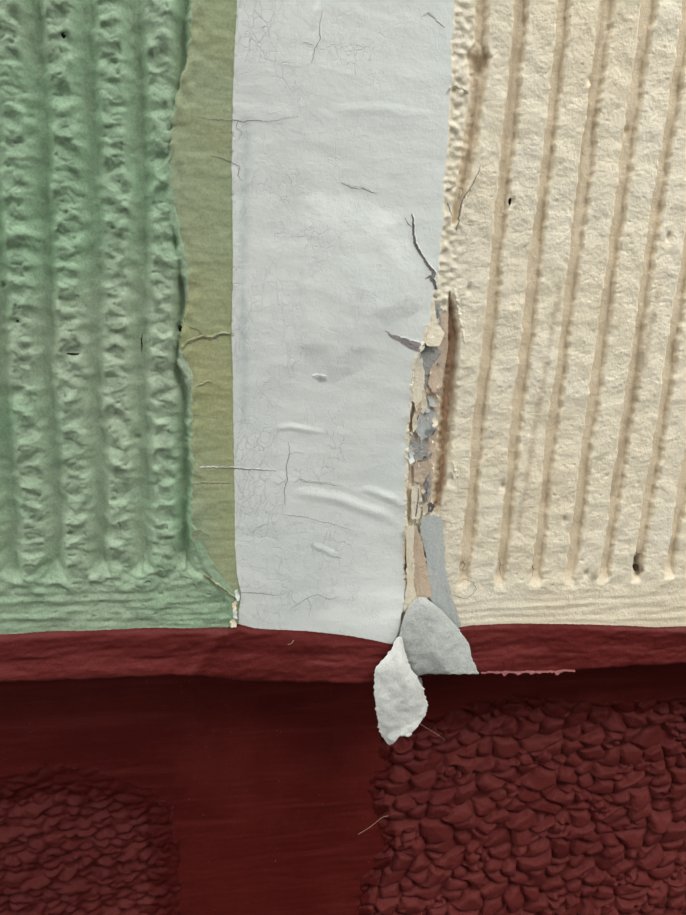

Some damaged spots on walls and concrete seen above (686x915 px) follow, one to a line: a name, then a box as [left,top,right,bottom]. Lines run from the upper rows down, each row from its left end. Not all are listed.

crack [304,11,324,63]
crack [422,12,446,28]
crack [198,116,297,134]
crack [341,182,377,193]
crack [405,213,438,290]
crack [386,331,427,353]
crack [192,442,348,558]
peeling [373,287,575,745]
crack [201,572,334,615]